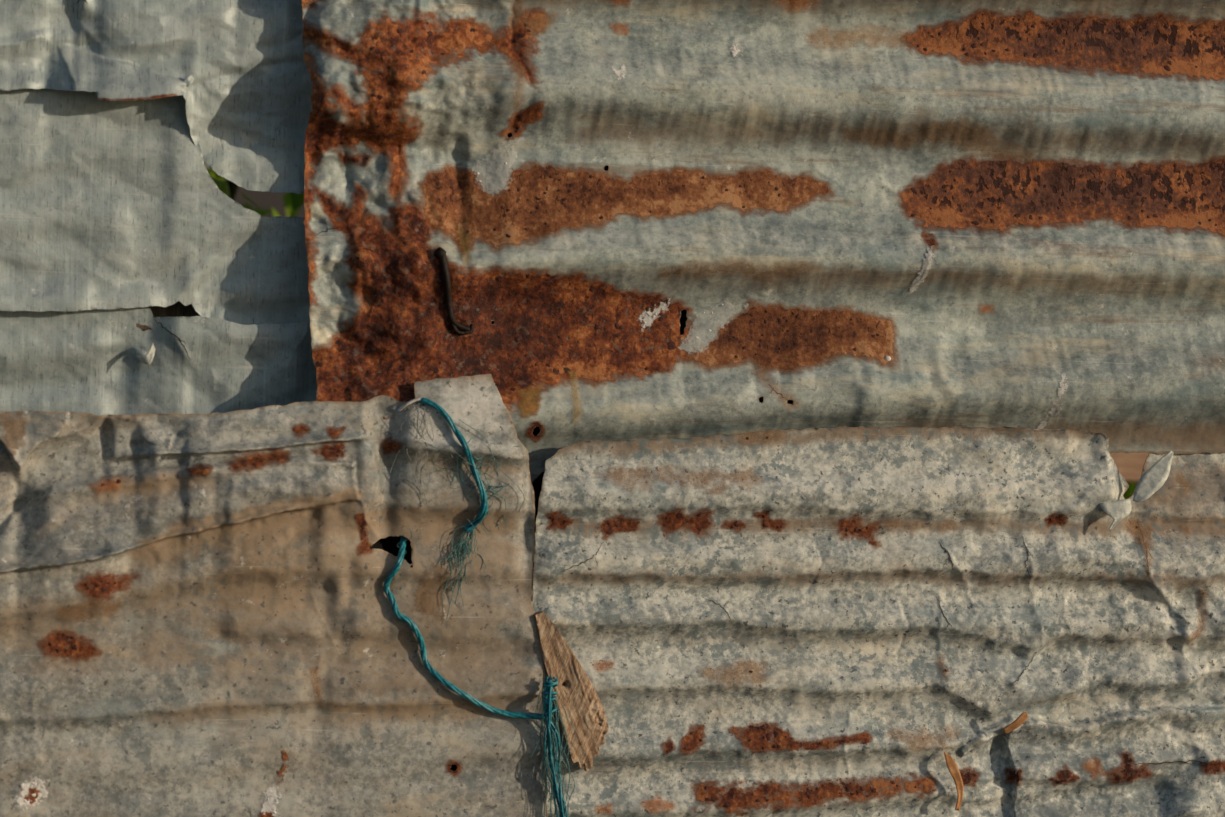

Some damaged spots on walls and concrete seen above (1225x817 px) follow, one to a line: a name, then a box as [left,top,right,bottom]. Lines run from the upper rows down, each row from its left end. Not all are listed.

rust [903,10,1225,81]
rust [898,156,1225,248]
rust [302,0,897,442]
rust [230,449,289,472]
rust [600,515,641,540]
rust [658,503,785,535]
rust [838,515,881,547]
rust [77,573,139,600]
rust [39,631,102,661]
rust [729,722,872,754]
rust [1049,752,1153,786]
rust [692,773,937,816]